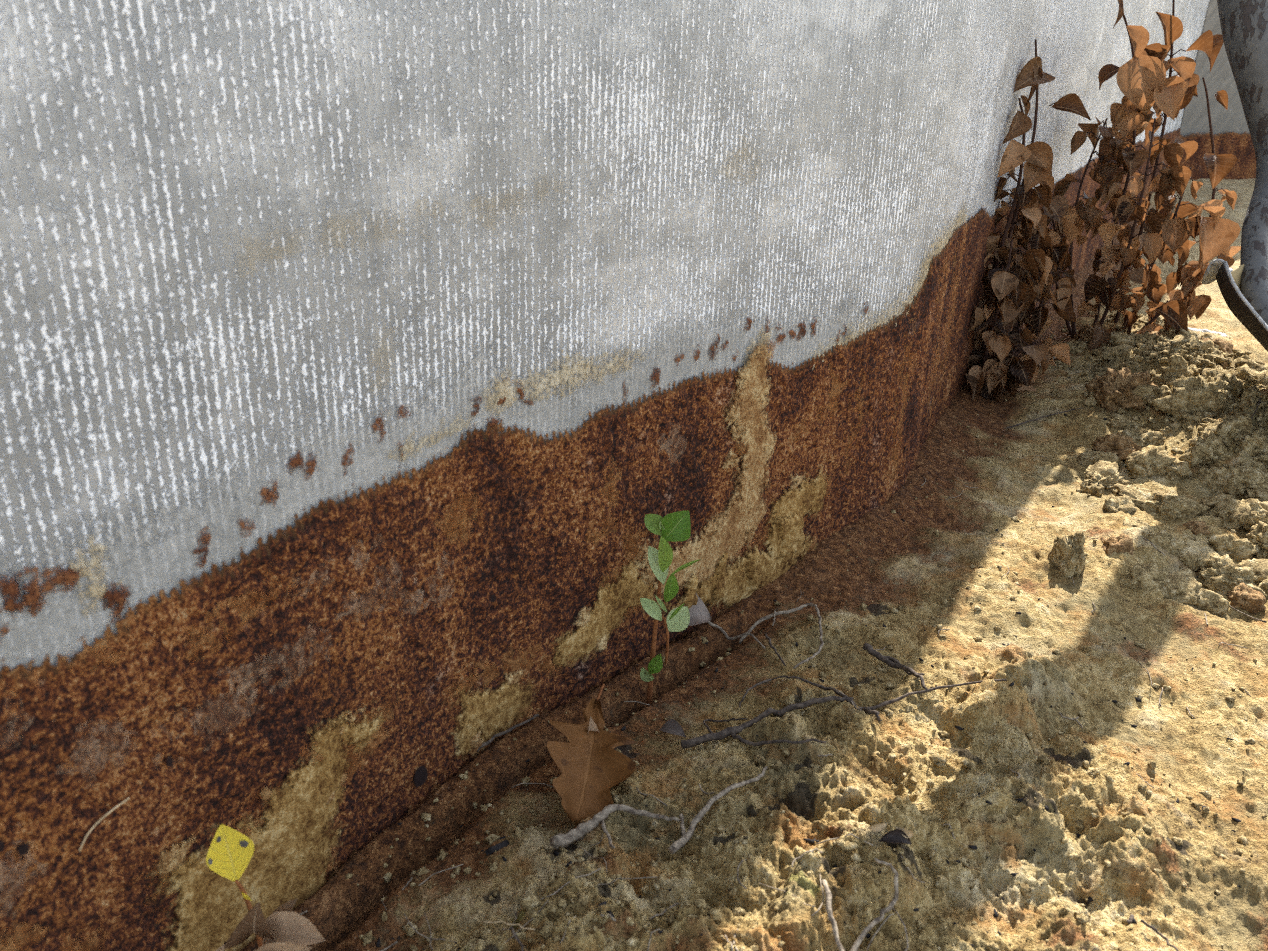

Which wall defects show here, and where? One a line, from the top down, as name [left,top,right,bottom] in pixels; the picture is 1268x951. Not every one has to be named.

rust [0,334,747,951]
leakage [0,297,862,674]
rust [716,201,1019,575]
rust [1010,157,1120,331]